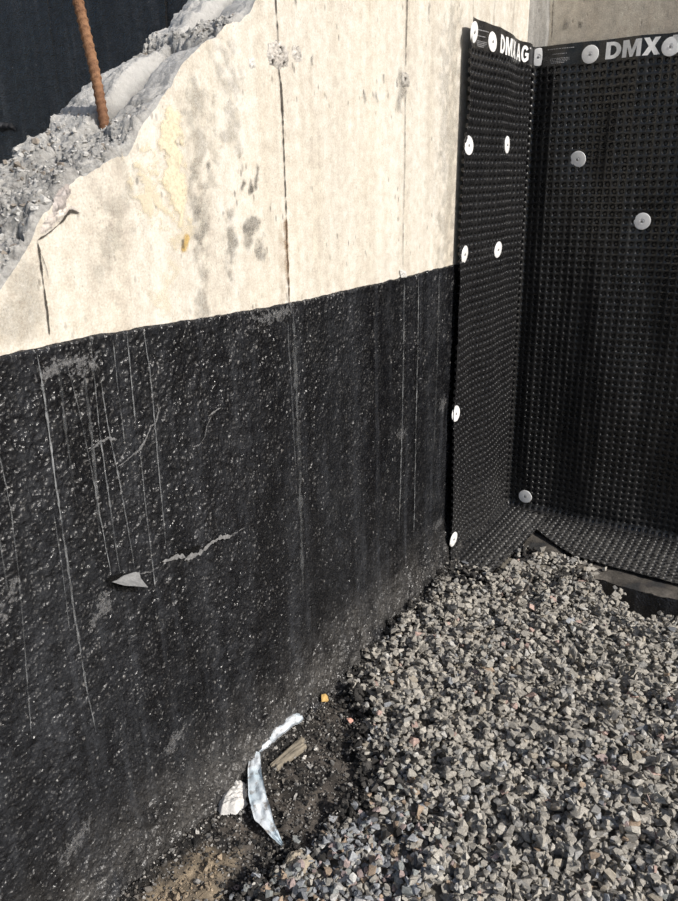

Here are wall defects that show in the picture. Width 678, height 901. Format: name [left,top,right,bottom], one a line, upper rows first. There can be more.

spalling [72,0,109,130]
spalling [267,40,302,70]
peeling [130,106,190,227]
spalling [40,184,79,234]
crack [144,529,242,574]